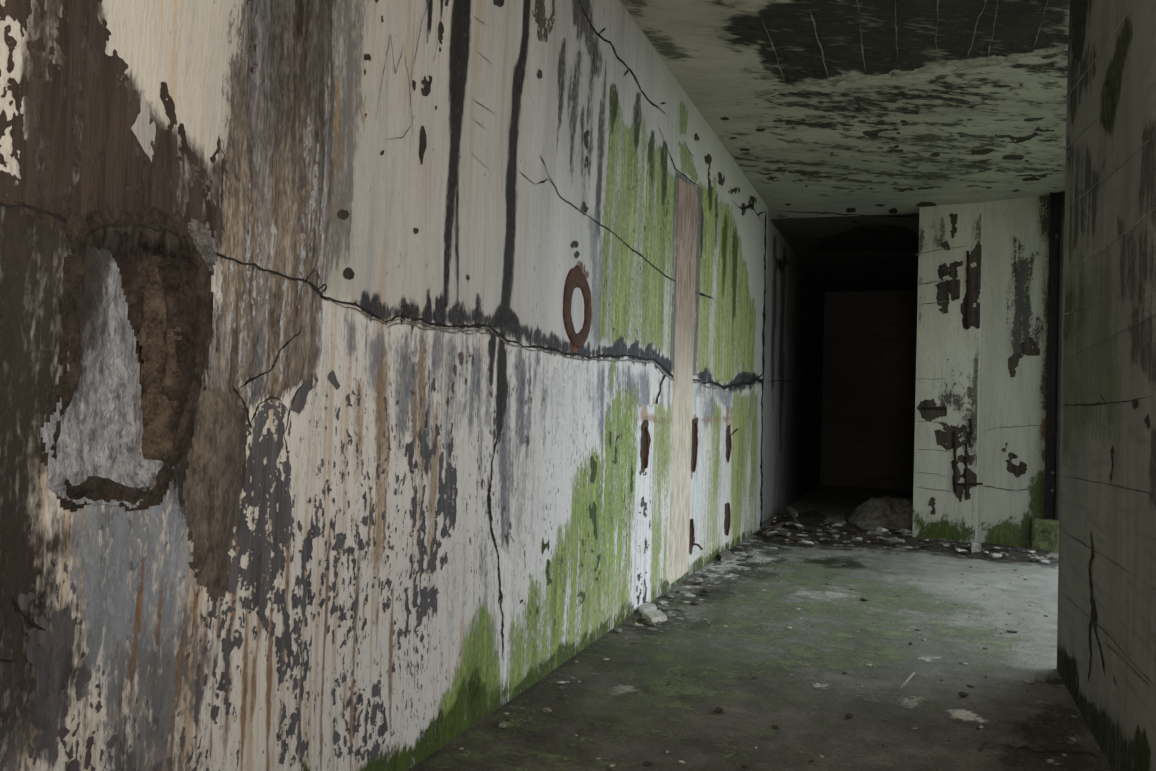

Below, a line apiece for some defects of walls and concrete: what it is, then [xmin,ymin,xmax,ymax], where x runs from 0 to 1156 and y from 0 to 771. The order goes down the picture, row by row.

crack [0,201,66,222]
spalling [0,0,229,512]
spalling [153,351,475,771]
crack [487,425,504,660]
crack [216,204,919,526]
water stain [347,0,789,682]
rust [636,405,663,473]
rust [689,519,703,555]
rust [691,408,739,472]
spalling [917,399,977,502]
spalling [1002,443,1027,478]
peeling [15,592,125,771]